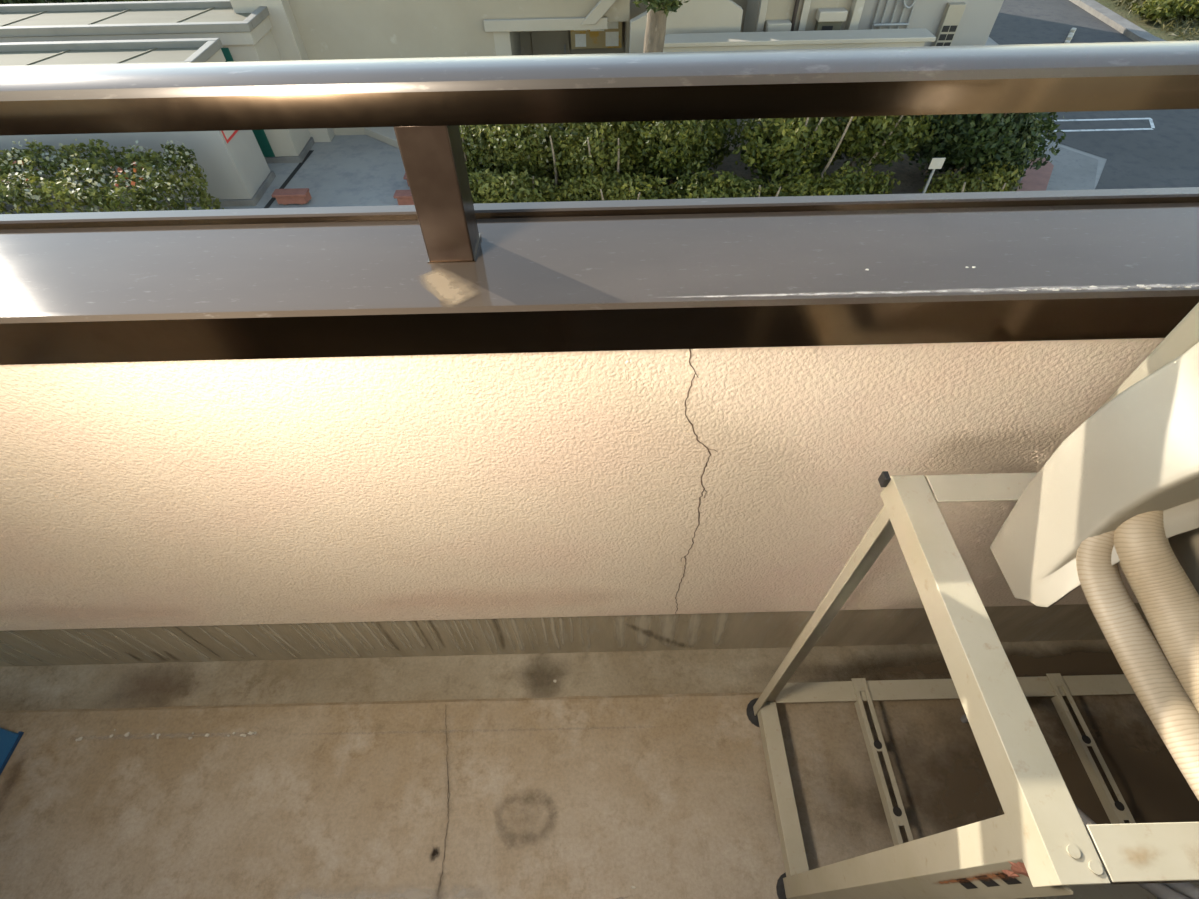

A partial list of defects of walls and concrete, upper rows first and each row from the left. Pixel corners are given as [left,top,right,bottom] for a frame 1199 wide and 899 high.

crack [675,349,717,615]